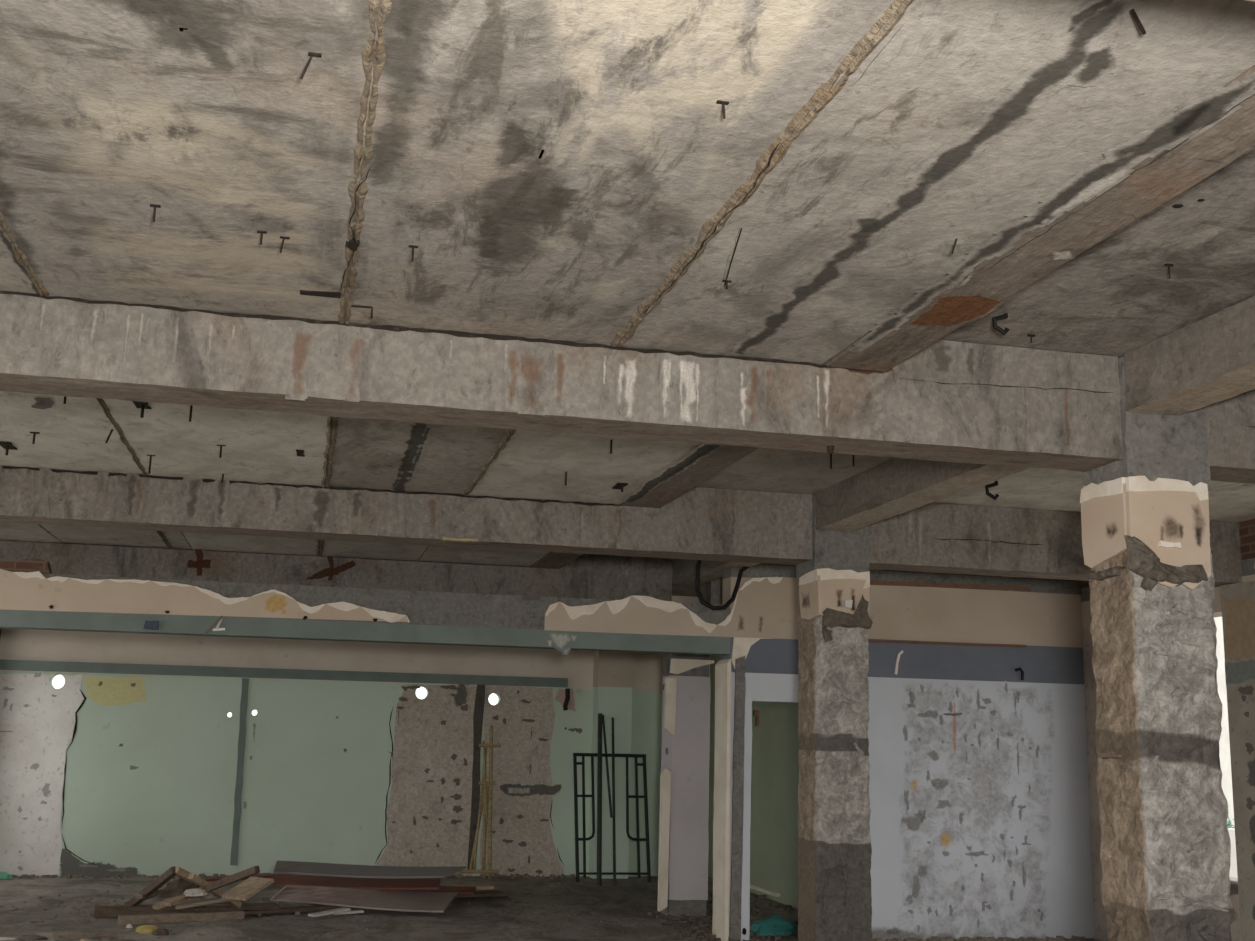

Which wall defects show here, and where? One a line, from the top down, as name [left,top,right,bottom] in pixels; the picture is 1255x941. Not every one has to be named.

damp [0,0,748,345]
damp [602,355,639,420]
damp [660,357,701,424]
crack [644,142,781,314]
damp [672,0,1143,356]
rust [908,294,1006,327]
damp [848,72,1255,352]
flaking render [0,558,410,623]
flaking render [544,577,799,669]
peeling [1221,594,1255,663]
flaking render [0,671,148,876]
flaking render [375,684,583,877]